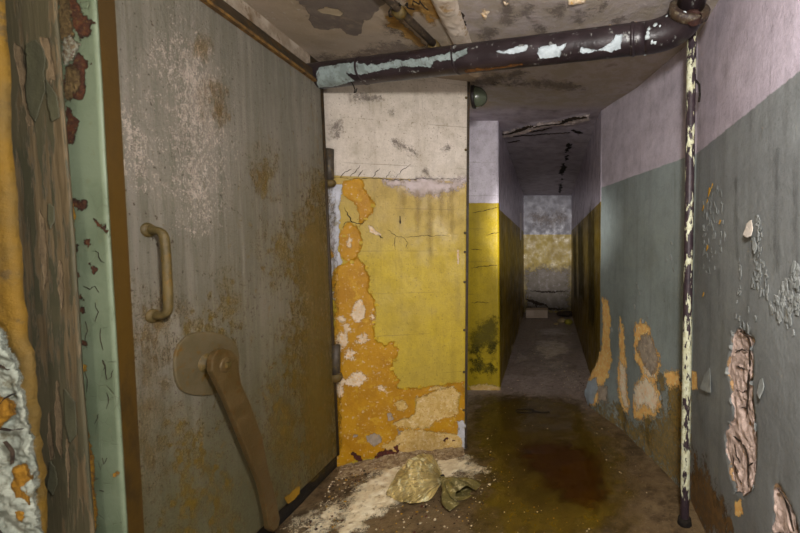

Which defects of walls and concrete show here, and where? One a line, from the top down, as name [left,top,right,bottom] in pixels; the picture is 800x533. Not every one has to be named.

peeling [13,37,60,126]
corrosion [58,0,96,145]
corrosion [73,198,88,222]
crack [334,166,463,181]
peeling [743,220,757,254]
spalling [0,328,77,533]
peeling [328,178,500,467]
water stain [468,316,499,374]
water stain [463,373,692,533]
peeling [584,298,682,422]
spalling [724,326,764,517]
spalling [772,483,799,533]